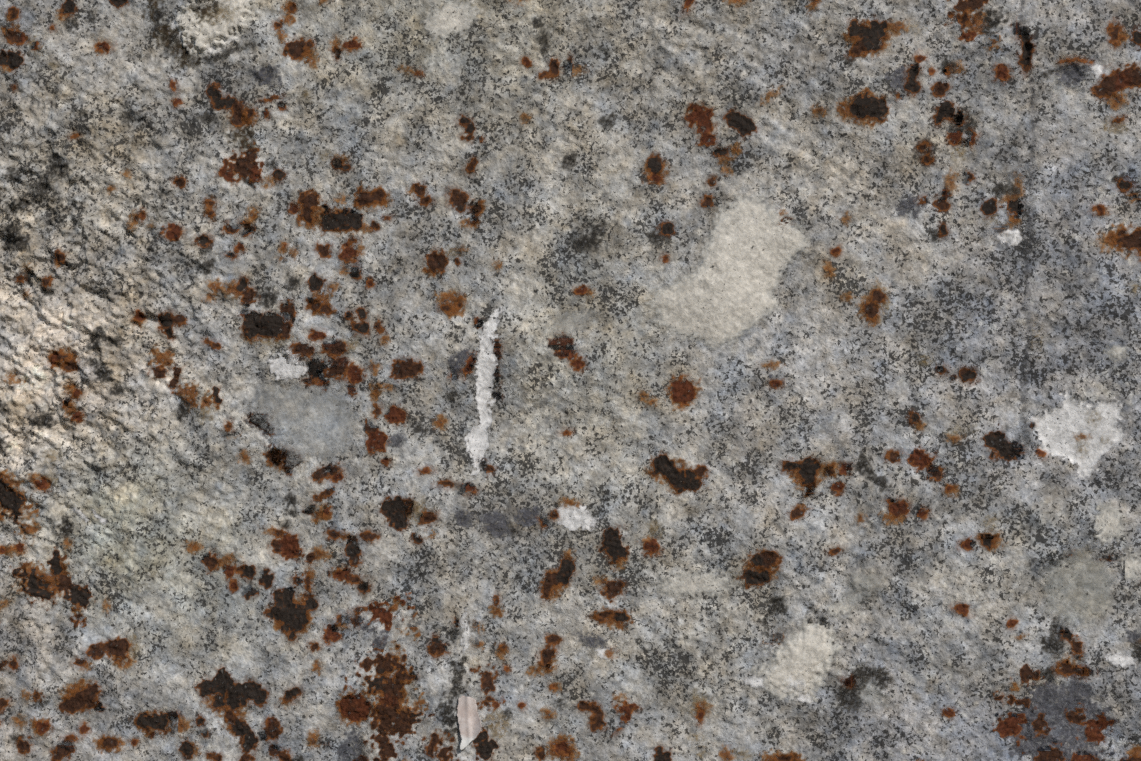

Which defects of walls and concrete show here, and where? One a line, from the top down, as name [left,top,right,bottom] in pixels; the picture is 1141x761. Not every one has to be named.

rust [843,19,913,66]
rust [945,0,1014,50]
rust [684,103,758,207]
rust [812,55,978,242]
rust [1091,63,1141,132]
rust [205,185,424,467]
rust [647,451,708,494]
rust [782,457,853,521]
rust [0,469,111,627]
rust [186,462,526,761]
rust [0,635,302,761]
rust [993,655,1141,761]